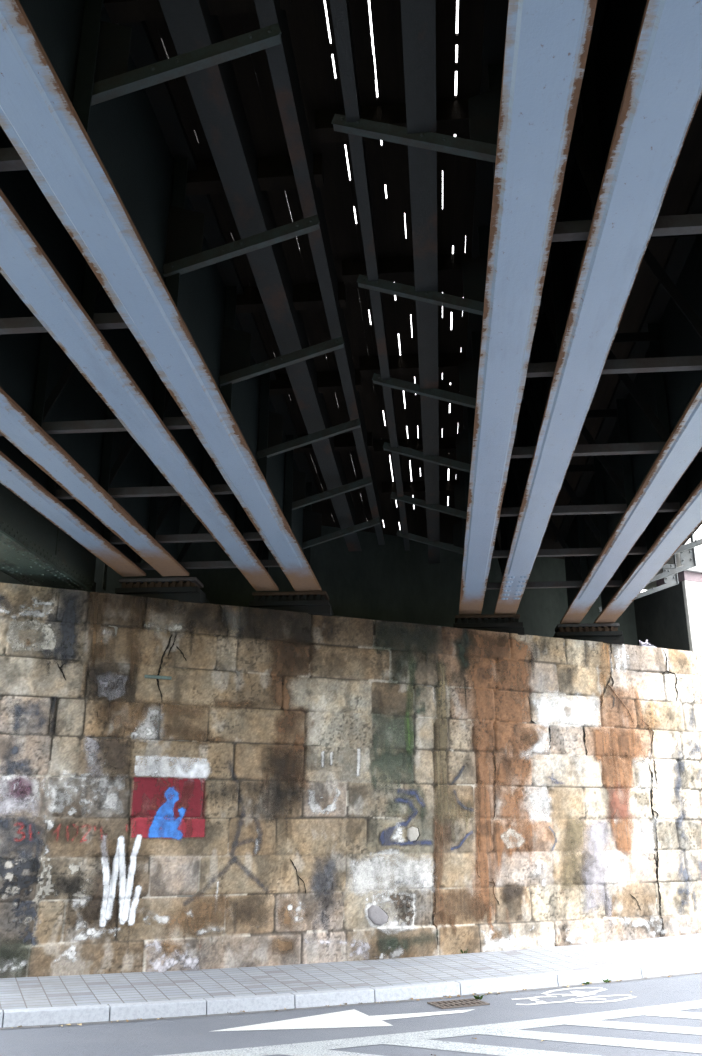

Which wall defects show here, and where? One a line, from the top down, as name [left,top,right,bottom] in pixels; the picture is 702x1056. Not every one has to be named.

crack [156,634,186,703]
rust [434,630,539,936]
crack [528,697,551,753]
rust [594,643,660,853]
crack [600,645,665,936]
crack [662,651,678,701]